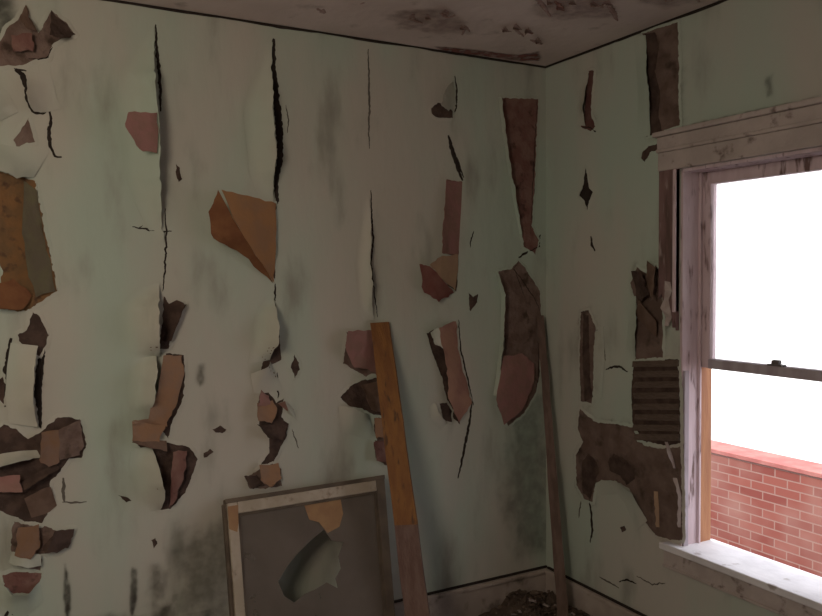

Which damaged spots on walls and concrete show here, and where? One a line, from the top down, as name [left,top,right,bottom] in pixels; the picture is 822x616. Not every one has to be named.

flaking render [0,11,75,66]
crack [102,0,728,149]
flaking render [502,98,539,253]
flaking render [639,136,658,165]
flaking render [642,22,680,131]
flaking render [0,171,57,356]
flaking render [138,297,213,510]
flaking render [427,329,460,424]
flaking render [498,261,541,426]
flaking render [576,266,684,540]
flaking render [0,417,86,594]